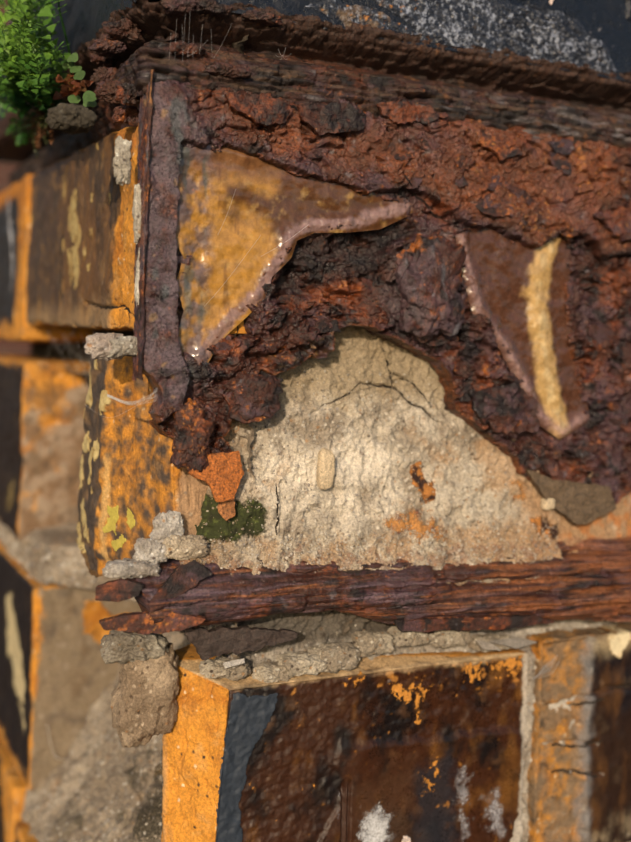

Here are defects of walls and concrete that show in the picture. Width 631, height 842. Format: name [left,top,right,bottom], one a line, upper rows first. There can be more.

peeling [305,0,620,76]
corrosion [224,89,292,127]
corrosion [376,99,448,125]
corrosion [548,138,575,176]
peeling [62,174,93,289]
corrosion [592,206,631,242]
crack [320,350,438,422]
corrosion [454,382,540,435]
corrosion [188,451,244,521]
spalling [82,600,112,644]
spalling [465,637,537,683]
spalling [389,683,433,725]